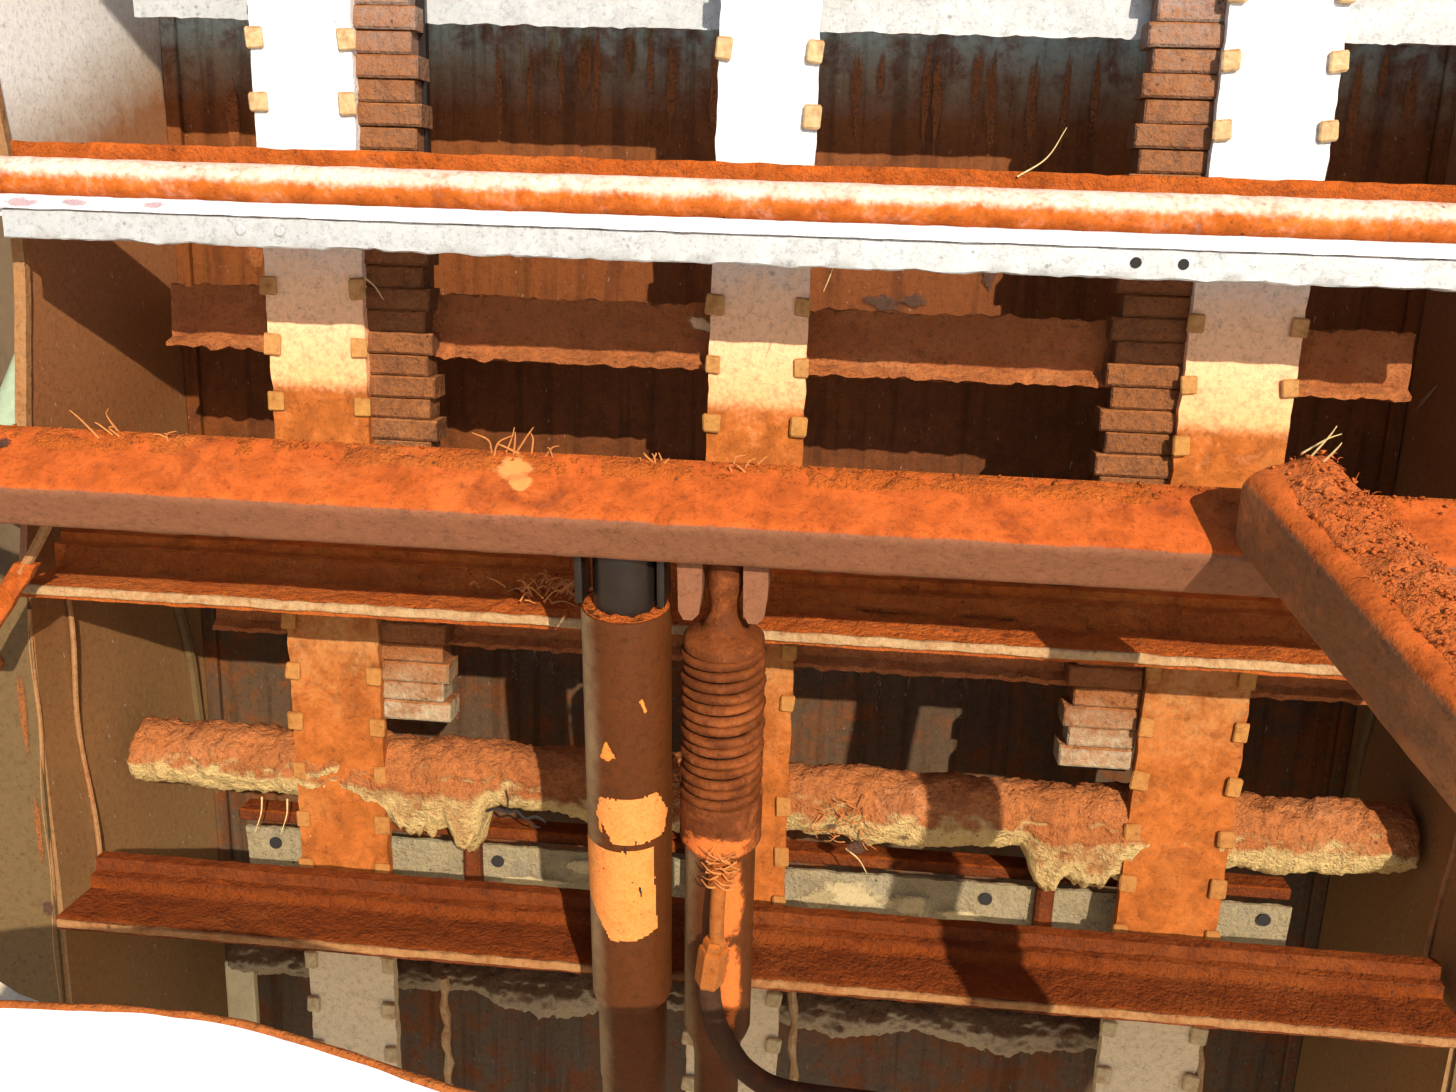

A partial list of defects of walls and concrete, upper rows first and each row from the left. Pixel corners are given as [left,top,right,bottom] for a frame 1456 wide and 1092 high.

peeling [498,457,533,491]
peeling [600,742,615,761]